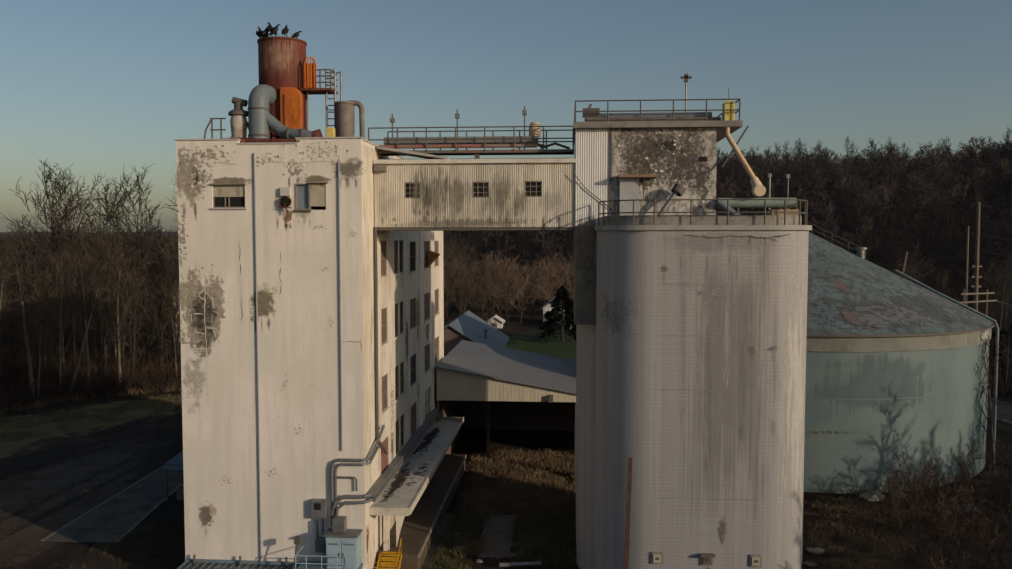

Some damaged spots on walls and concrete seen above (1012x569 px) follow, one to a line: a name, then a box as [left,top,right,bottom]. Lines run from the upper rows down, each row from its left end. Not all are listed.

rust [258,36,303,91]
leakage [413,167,471,223]
peeling [614,128,714,206]
peeling [171,140,235,363]
peeling [846,287,975,328]